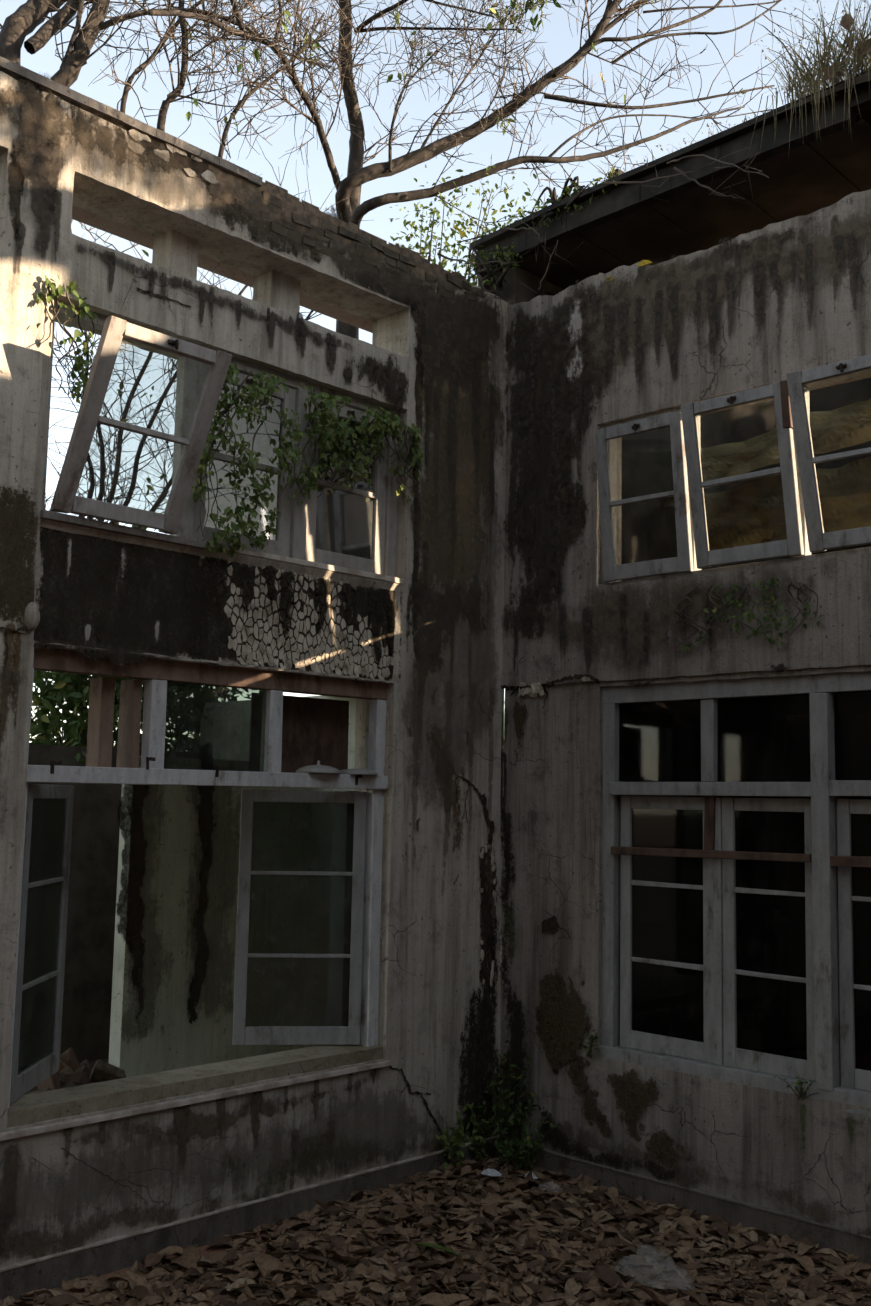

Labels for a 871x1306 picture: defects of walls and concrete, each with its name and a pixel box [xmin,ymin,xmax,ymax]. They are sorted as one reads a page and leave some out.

leakage [0,74,175,274]
leakage [76,183,871,749]
leakage [0,486,201,745]
peeling [182,553,403,684]
crack [388,1065,442,1135]
leakage [535,968,841,1226]